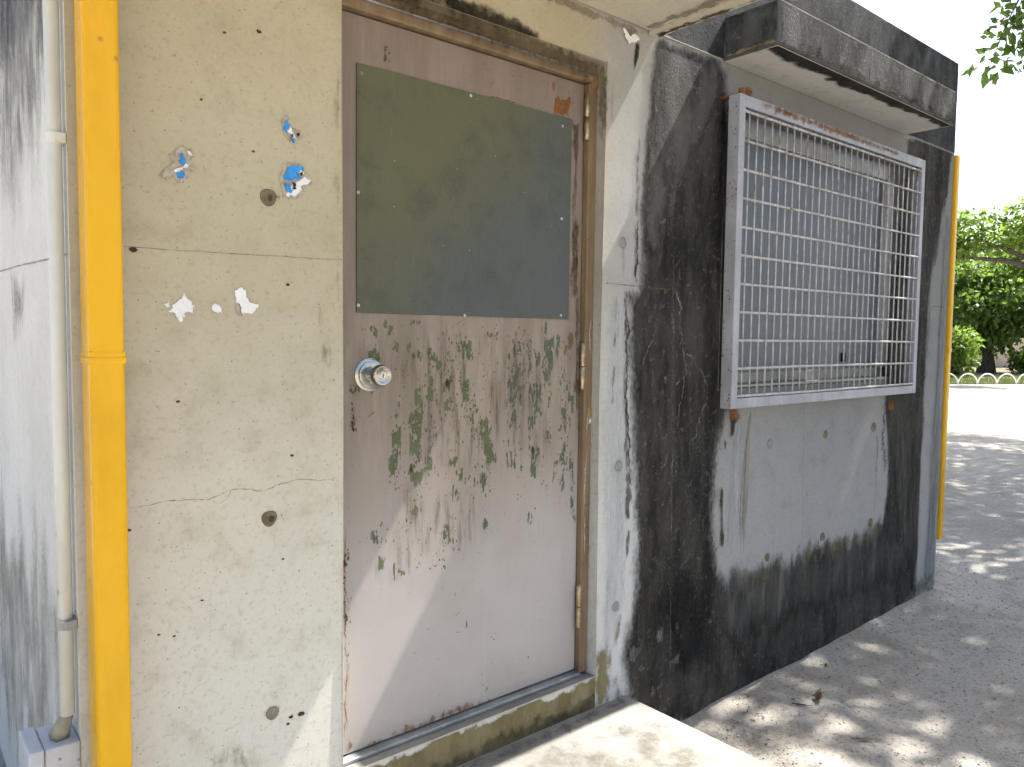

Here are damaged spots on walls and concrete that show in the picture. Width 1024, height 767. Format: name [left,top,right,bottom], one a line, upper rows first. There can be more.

corrosion [553,82,571,115]
peeling [283,119,300,143]
corrosion [766,105,898,155]
peeling [174,150,192,179]
peeling [283,165,311,198]
peeling [570,221,579,294]
peeling [164,293,195,322]
peeling [235,287,259,314]
water stain [373,0,959,767]
corrosion [721,384,738,435]
peeling [360,307,592,580]